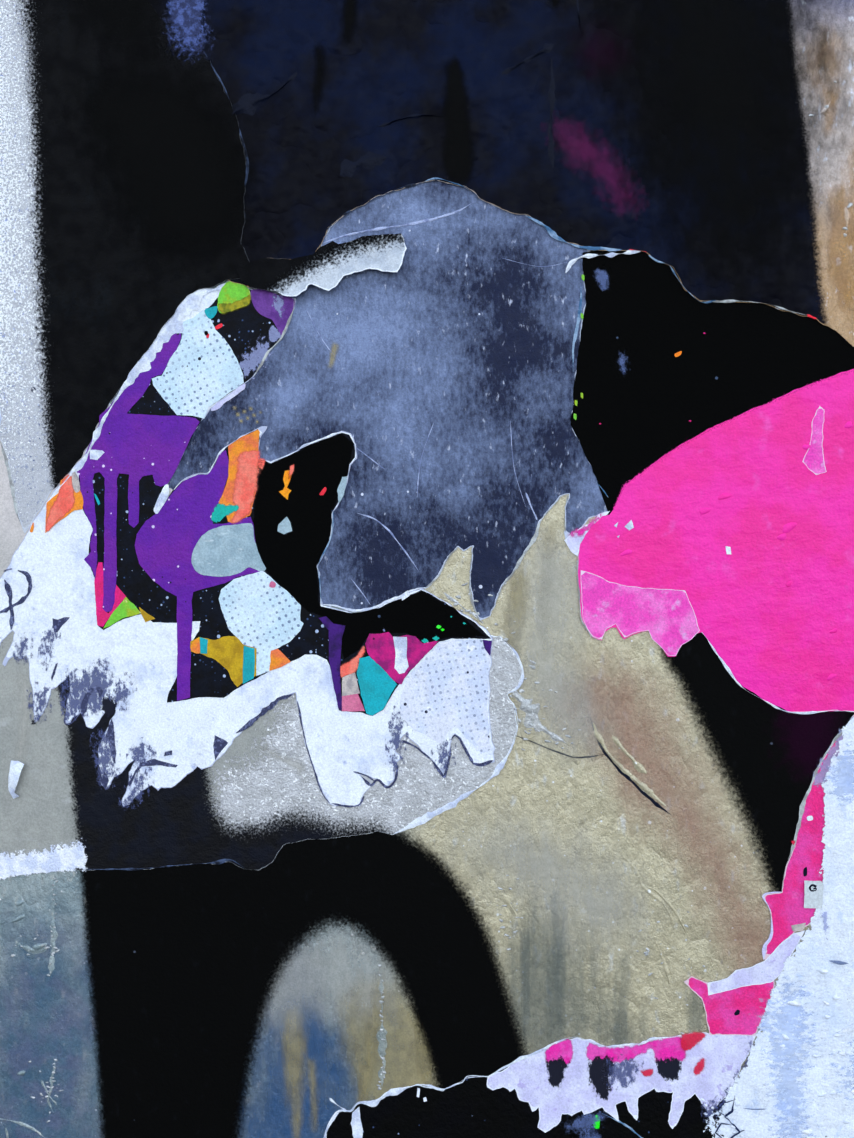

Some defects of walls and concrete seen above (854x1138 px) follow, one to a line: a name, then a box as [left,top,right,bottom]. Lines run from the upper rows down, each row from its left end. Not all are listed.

peeling [444,571,516,648]
crack [515,717,671,815]